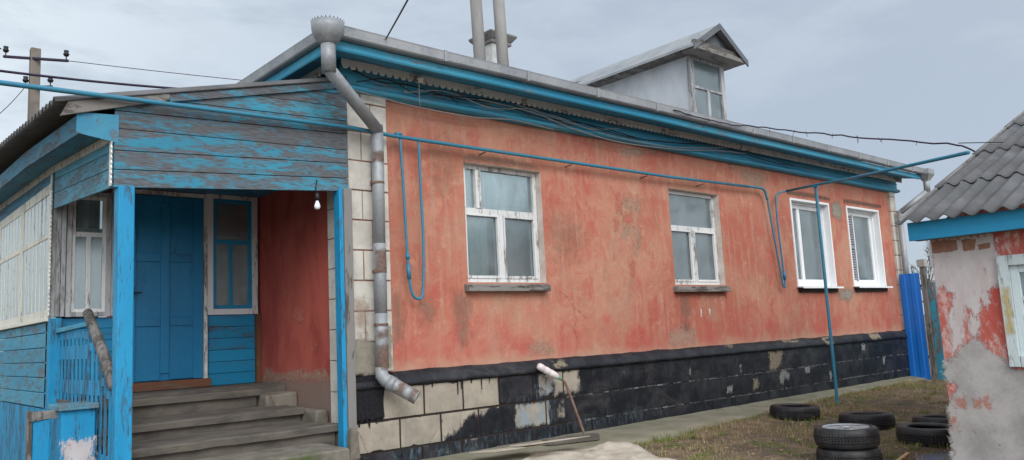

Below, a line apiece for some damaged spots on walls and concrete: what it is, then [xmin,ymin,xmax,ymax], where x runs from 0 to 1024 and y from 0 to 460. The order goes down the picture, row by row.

rust [375,250,387,270]
rust [378,330,389,369]
peeling [768,340,798,384]
flaking render [928,233,1024,460]
peeling [59,436,97,460]